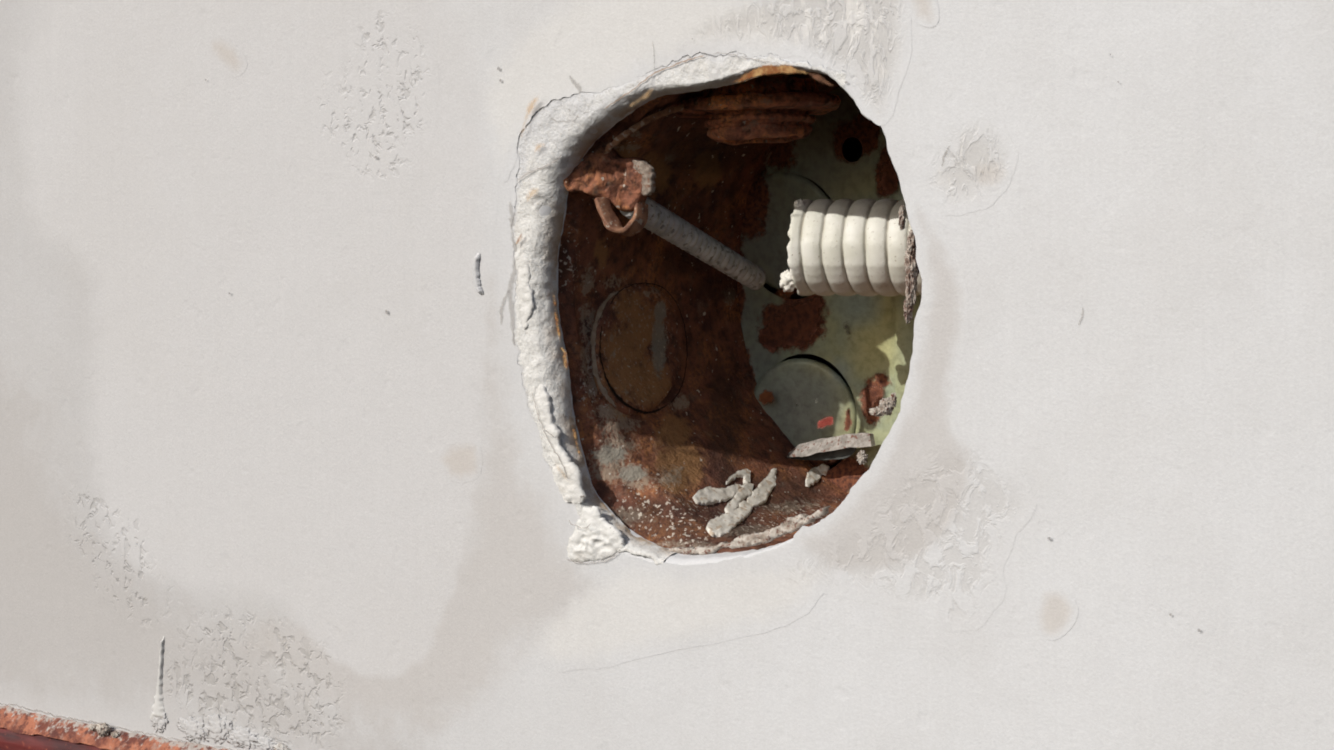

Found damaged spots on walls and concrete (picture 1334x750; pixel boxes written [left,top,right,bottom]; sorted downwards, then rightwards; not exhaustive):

rust [739,64,831,85]
peeling [150,600,355,750]